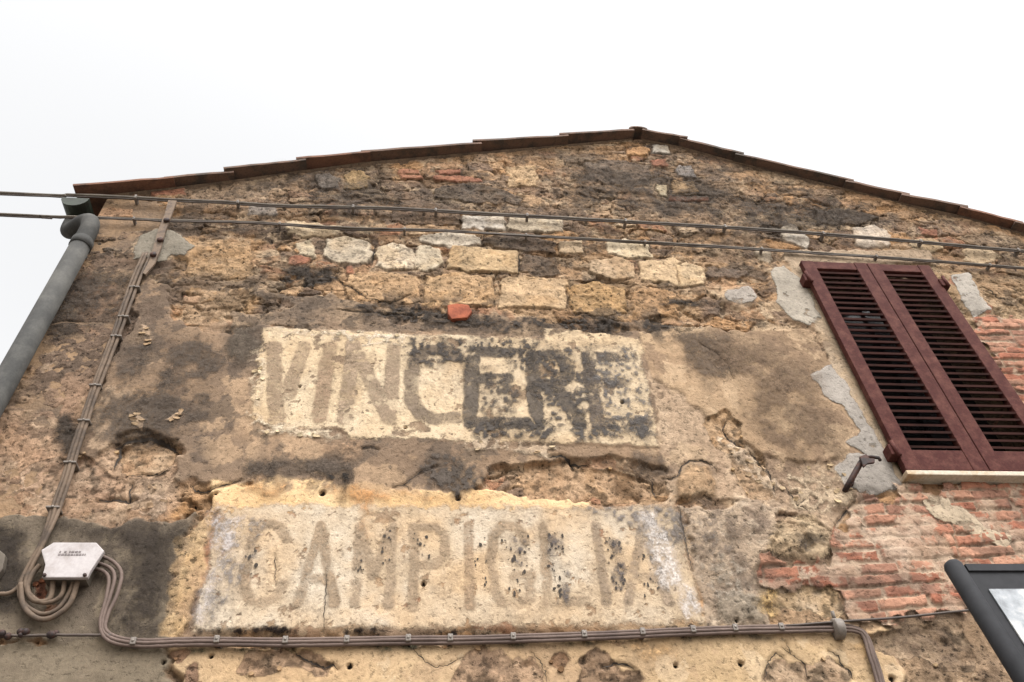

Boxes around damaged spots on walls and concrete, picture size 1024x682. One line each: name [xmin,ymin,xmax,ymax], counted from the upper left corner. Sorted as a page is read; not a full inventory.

damp [91,323,262,451]
damp [345,299,840,473]
flaking render [970,314,1024,403]
damp [57,413,76,454]
spalling [19,412,182,523]
damp [243,454,354,489]
spalling [465,436,655,507]
crack [722,422,809,511]
damp [0,522,27,612]
damp [55,520,184,633]
flaking render [703,408,1024,673]
mould [217,625,296,635]